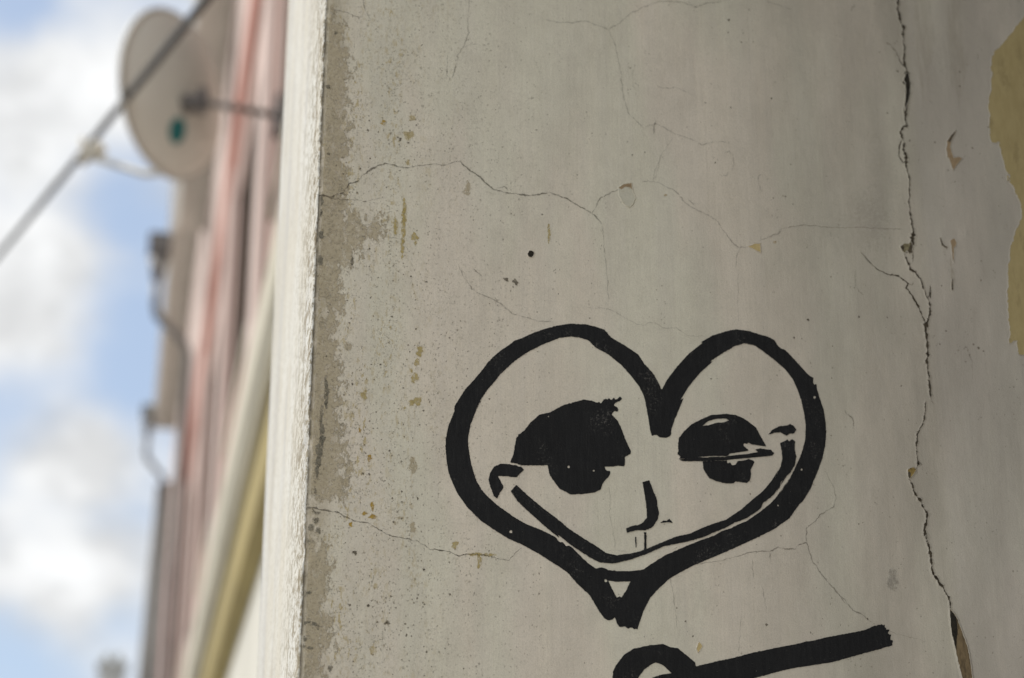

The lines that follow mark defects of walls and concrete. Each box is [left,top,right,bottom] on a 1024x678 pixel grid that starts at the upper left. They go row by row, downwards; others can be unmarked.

crack [322,161,617,290]
crack [860,0,974,678]
peeling [987,16,1024,356]